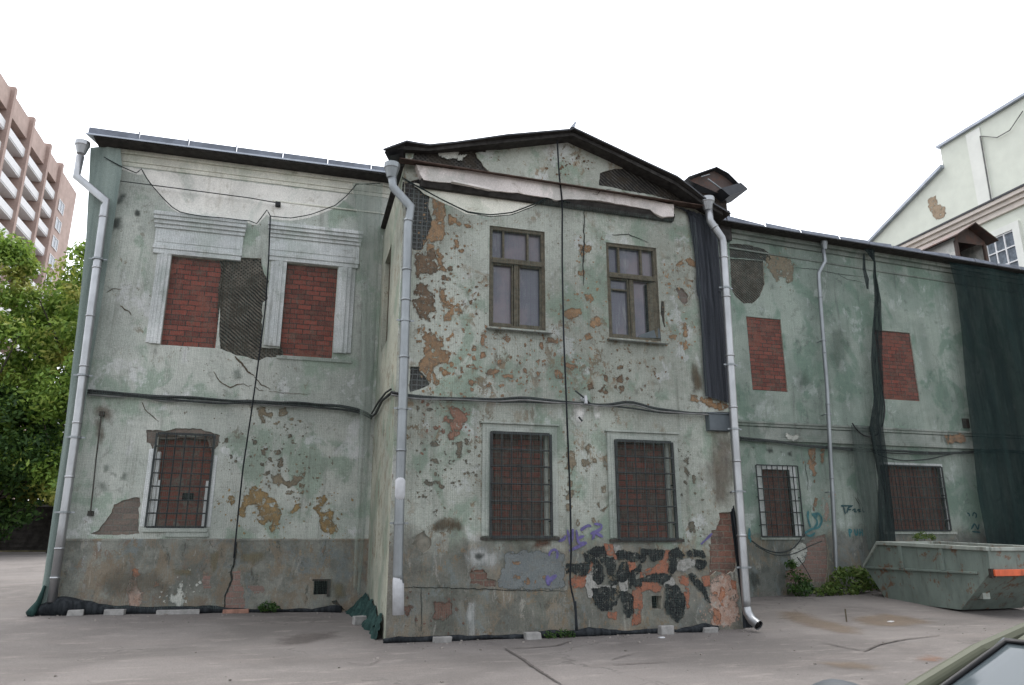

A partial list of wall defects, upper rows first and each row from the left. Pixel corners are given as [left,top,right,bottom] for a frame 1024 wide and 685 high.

peeling [438,152,467,161]
crack [214,356,300,394]
peeling [411,194,667,516]
crack [581,189,633,286]
peeling [661,250,696,363]
peeling [729,244,800,292]
peeling [928,195,946,220]
flaking render [91,497,141,535]
crack [224,542,237,607]
peeling [146,399,354,547]
peeling [559,429,608,539]
flaking render [678,442,740,628]